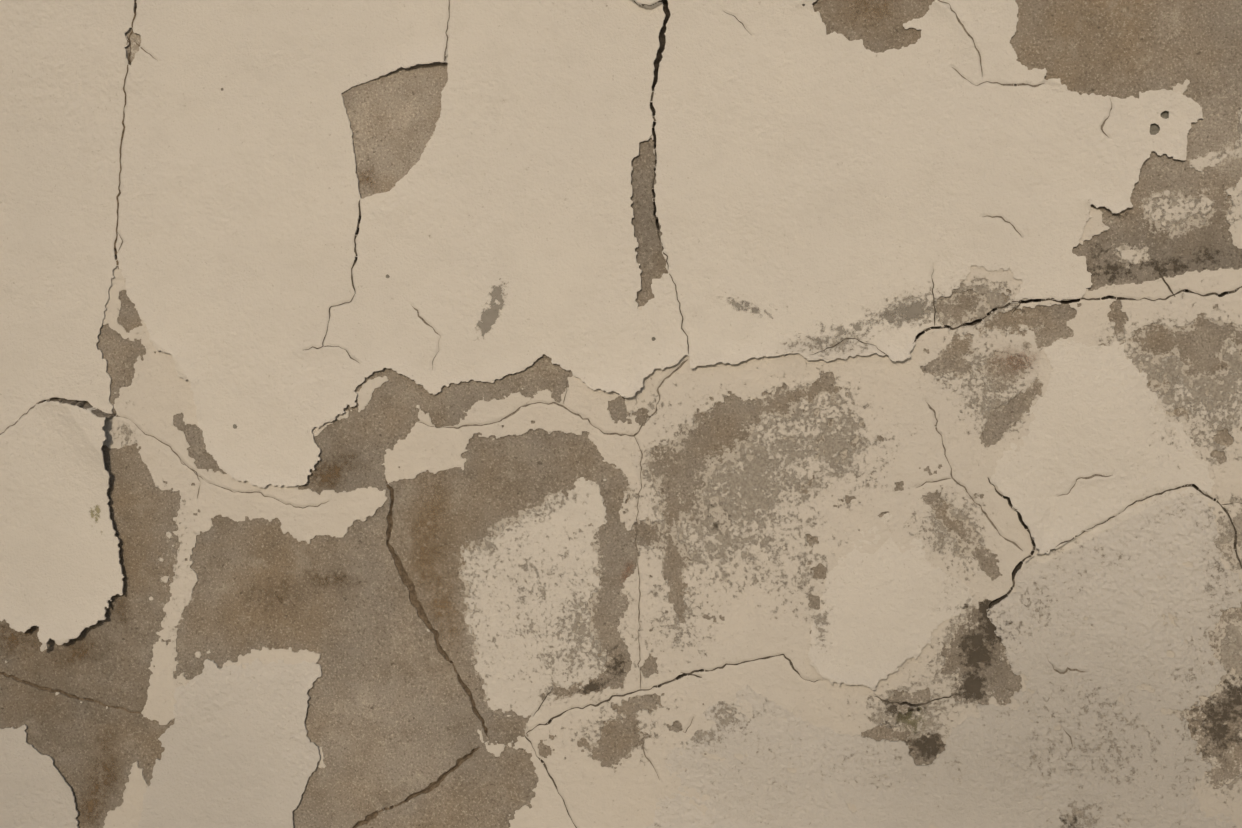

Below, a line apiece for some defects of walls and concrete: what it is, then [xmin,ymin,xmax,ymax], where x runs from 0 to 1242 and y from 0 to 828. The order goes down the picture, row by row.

peeling [97,290,156,414]
crack [114,0,158,269]
crack [0,397,328,508]
peeling [342,19,449,199]
crack [352,479,490,828]
peeling [0,354,884,828]
crack [420,0,818,828]
peeling [631,108,668,307]
peeling [806,490,1023,765]
peeling [802,0,1242,565]
crack [811,265,1242,362]
crack [916,403,1242,613]